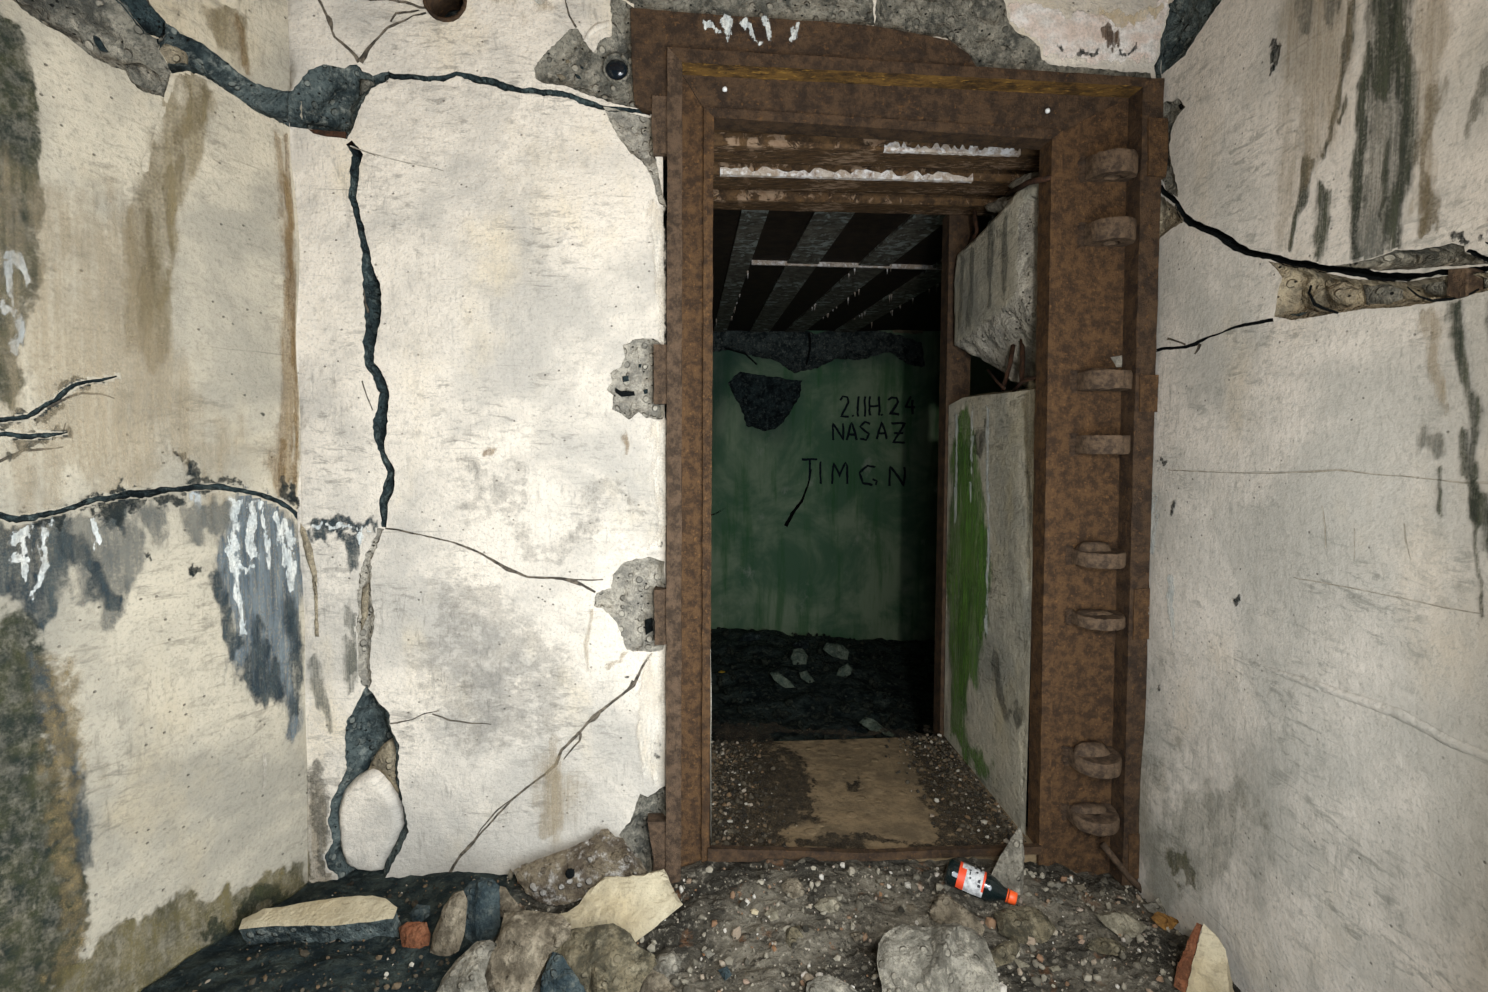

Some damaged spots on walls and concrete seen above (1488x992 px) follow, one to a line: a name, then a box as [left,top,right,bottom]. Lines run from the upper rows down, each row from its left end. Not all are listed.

crack [318,0,650,116]
spalling [534,0,1221,208]
rust [1101,22,1120,52]
water stain [1288,0,1437,262]
water stain [0,15,105,461]
crack [1161,185,1488,314]
crack [347,141,603,593]
spalling [607,338,665,420]
crack [0,483,298,523]
spalling [594,542,665,652]
water stain [0,460,384,992]
peeling [325,685,409,879]